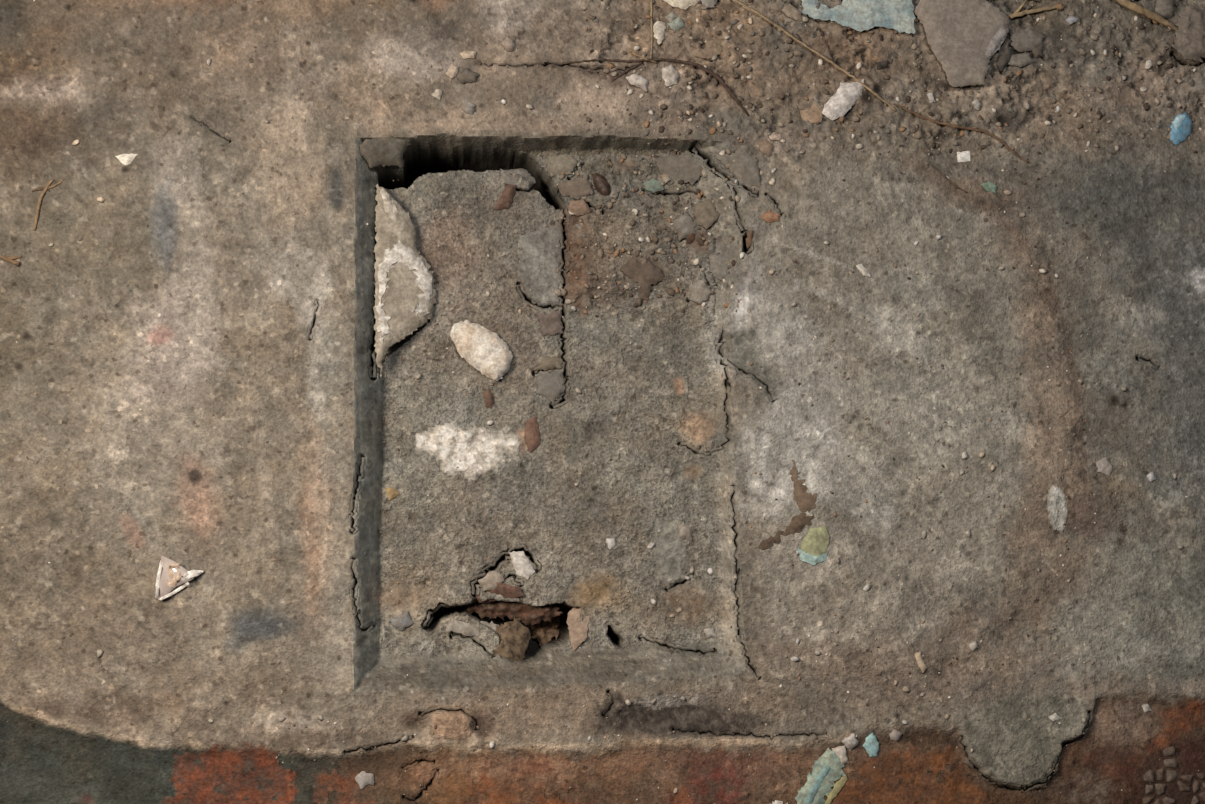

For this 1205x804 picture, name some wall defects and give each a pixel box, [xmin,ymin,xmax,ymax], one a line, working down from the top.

crack [688,268,717,304]
spalling [856,263,871,277]
crack [678,330,776,459]
spalling [352,132,782,804]
spalling [1096,457,1112,476]
crack [348,457,374,634]
crack [640,486,761,680]
peeling [830,732,993,804]
corrosion [1074,697,1205,786]